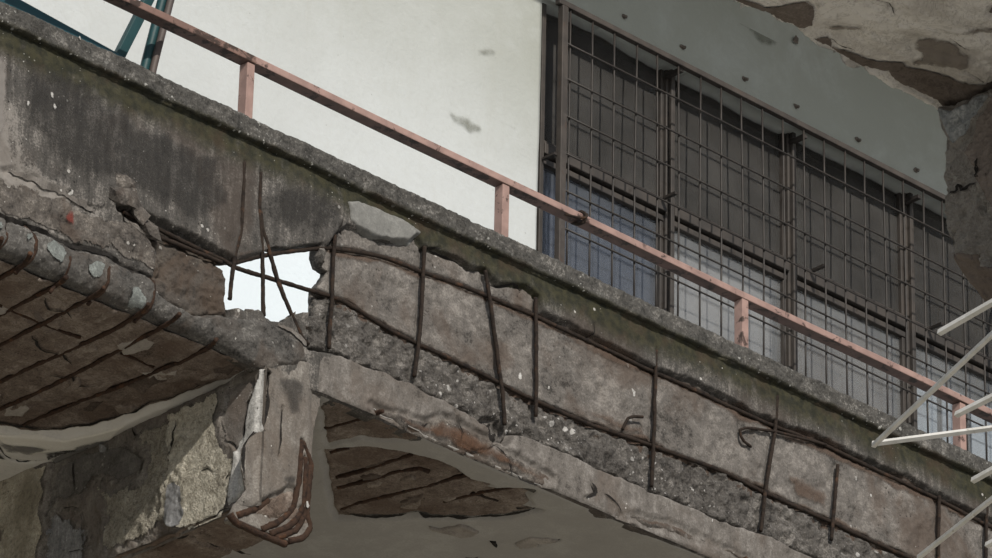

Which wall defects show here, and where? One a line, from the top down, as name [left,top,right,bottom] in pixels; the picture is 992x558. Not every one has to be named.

peeling [736,0,814,28]
peeling [814,37,992,143]
spalling [0,161,992,558]